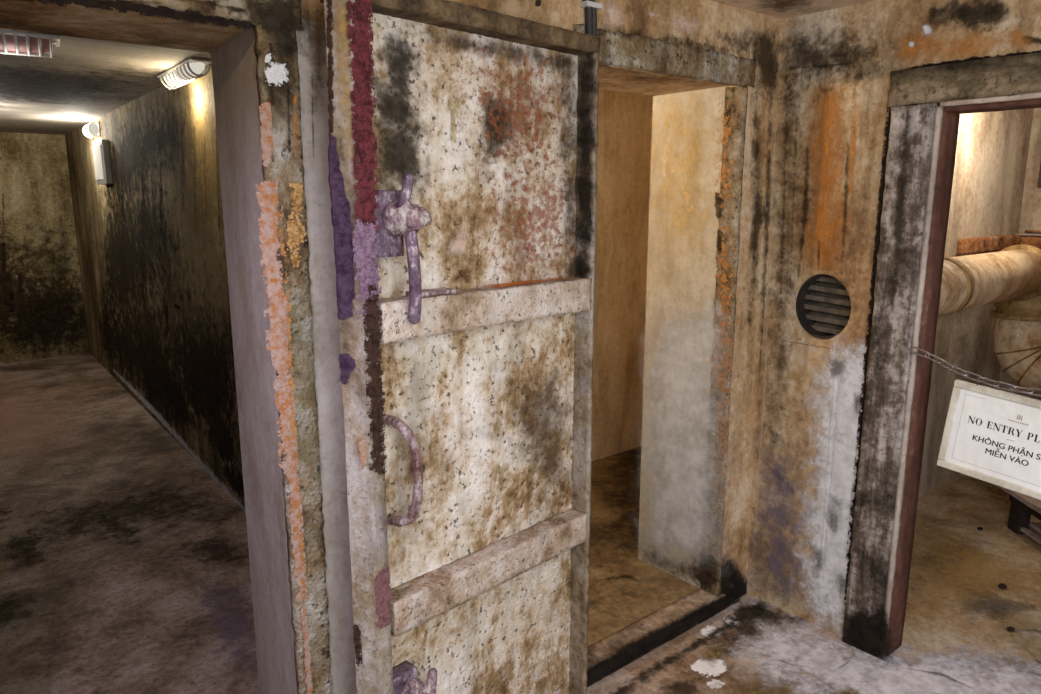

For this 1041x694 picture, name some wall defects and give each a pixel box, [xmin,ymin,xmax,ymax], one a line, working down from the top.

leakage [0,98,247,567]
peeling [264,53,289,87]
rust [275,193,306,620]
rust [450,35,579,288]
leakage [587,318,794,694]
rust [710,94,737,496]
leakage [726,32,876,316]
leakage [754,345,893,661]
leakage [891,112,910,306]
leakage [923,0,1008,34]